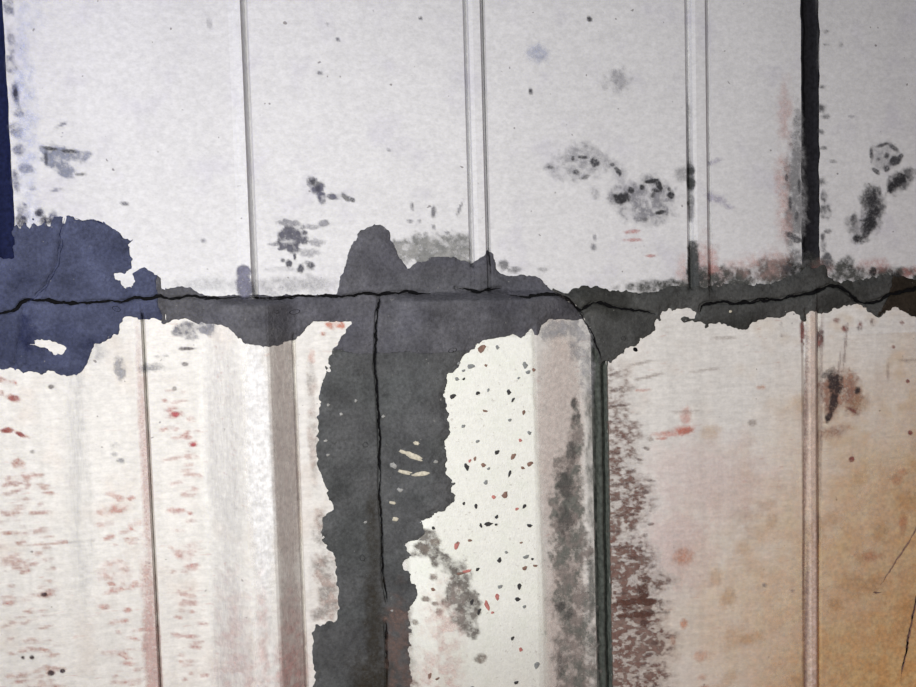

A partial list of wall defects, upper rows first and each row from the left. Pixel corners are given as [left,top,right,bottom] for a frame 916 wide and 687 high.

leakage [16,204,56,226]
crack [459,288,654,357]
leakage [565,146,621,175]
leakage [609,177,674,221]
leakage [628,115,916,291]
crack [700,284,916,311]
crack [0,218,430,687]
leakage [272,344,304,687]
leakage [314,557,338,619]
leakage [540,320,599,687]
rust [608,402,673,687]
rust [794,321,916,687]